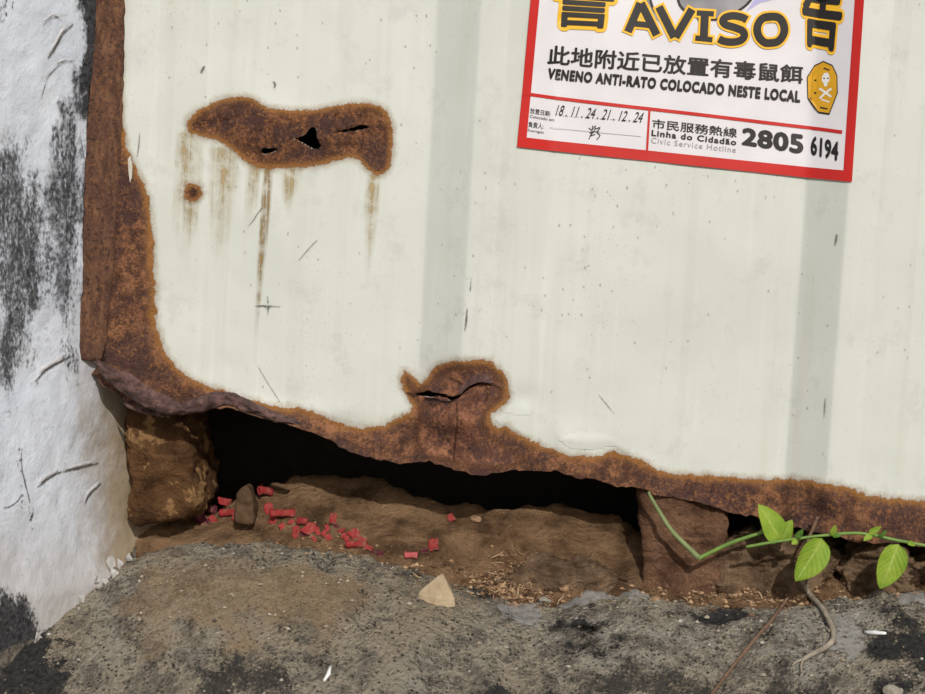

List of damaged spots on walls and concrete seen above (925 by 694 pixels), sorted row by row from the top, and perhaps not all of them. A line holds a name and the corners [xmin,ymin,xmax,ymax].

corrosion [91,111,233,411]
corrosion [182,96,393,280]
crack [407,377,462,460]
corrosion [217,358,925,547]